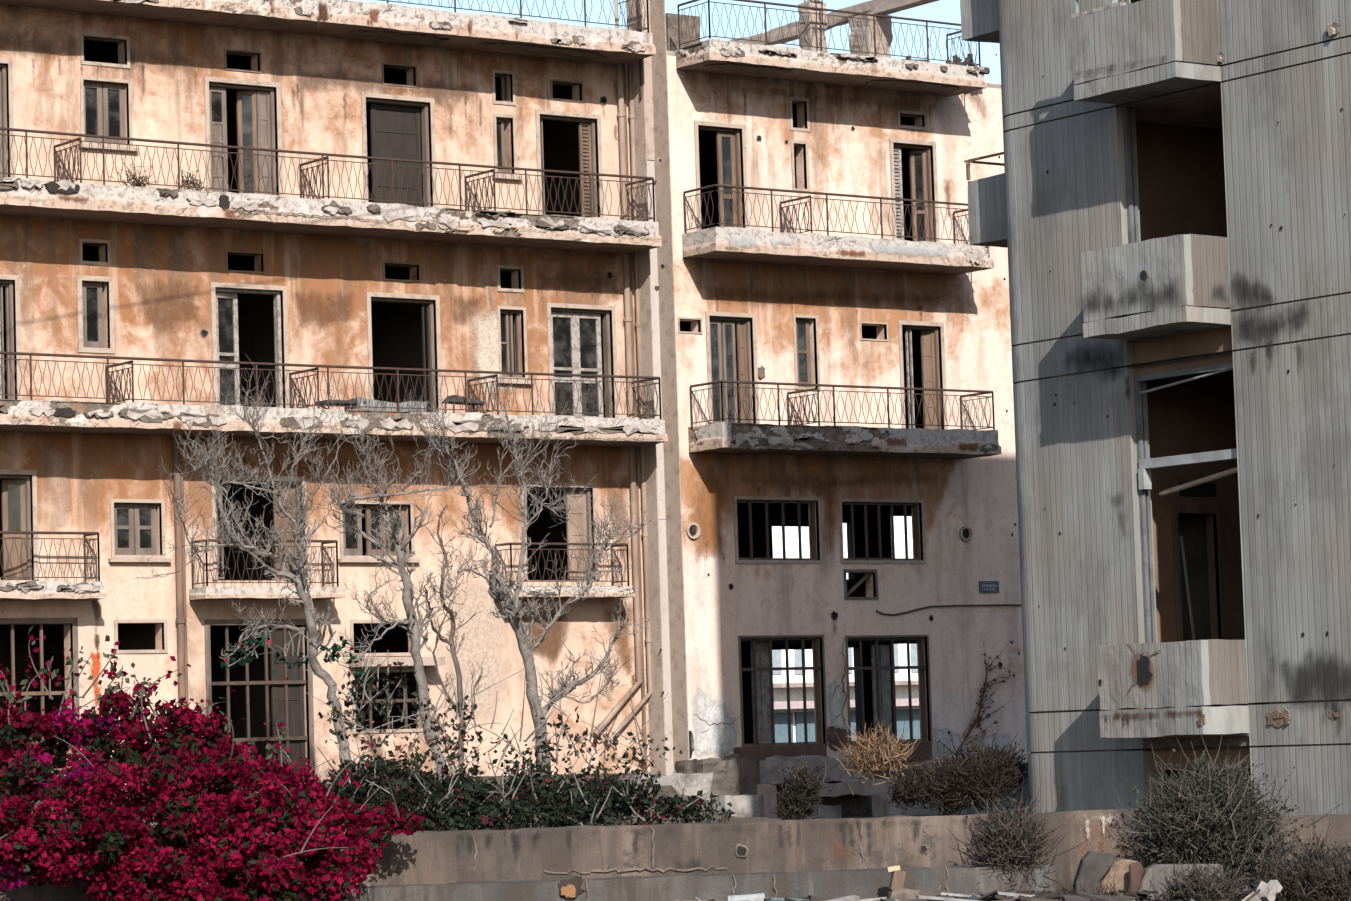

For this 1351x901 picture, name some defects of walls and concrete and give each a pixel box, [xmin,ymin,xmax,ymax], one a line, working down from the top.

flaking render [294,5,314,17]
spalling [349,20,453,44]
spalling [479,35,607,59]
flaking render [621,41,646,53]
flaking render [0,177,80,194]
flaking render [159,188,258,212]
flaking render [321,200,458,231]
leakage [1084,284,1175,308]
leakage [1215,279,1306,367]
flaking render [29,403,227,429]
flaking render [730,433,826,450]
leakage [1287,657,1351,713]